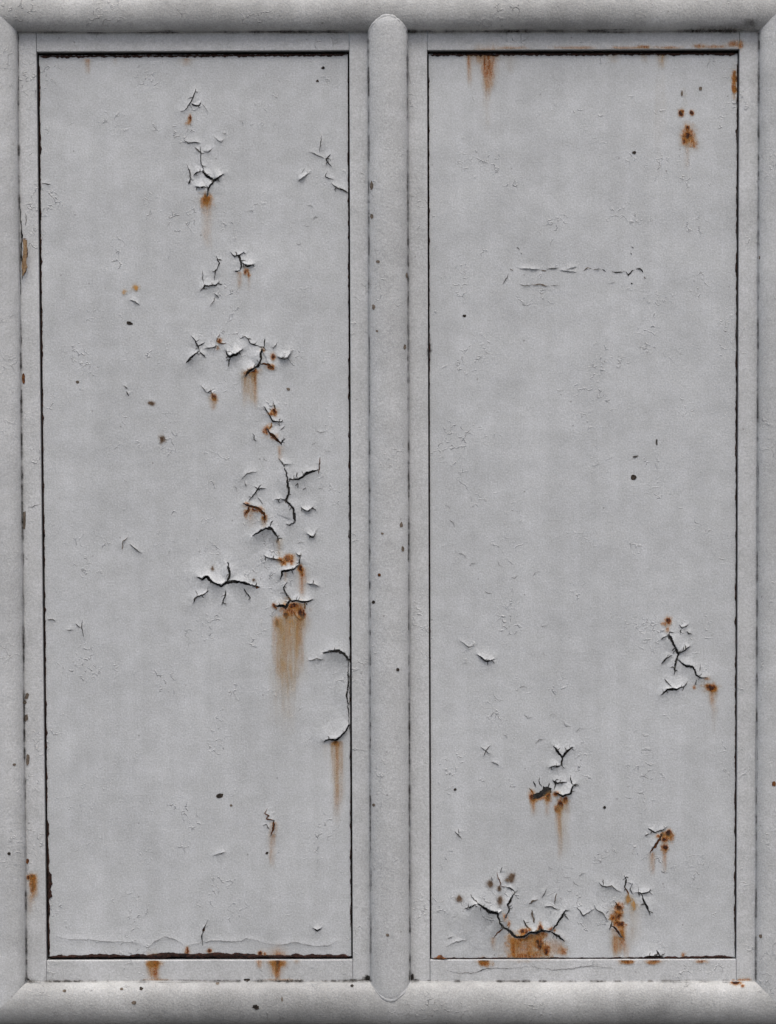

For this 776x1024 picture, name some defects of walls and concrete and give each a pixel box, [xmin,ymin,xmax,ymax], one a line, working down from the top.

crack [173,81,243,148]
rust [431,42,743,147]
rust [39,54,347,366]
crack [230,426,303,545]
rust [272,602,306,640]
peeling [298,639,350,750]
crack [255,802,285,844]
rust [332,727,351,926]
rust [433,616,736,966]
crack [638,819,676,862]
rust [27,820,349,980]